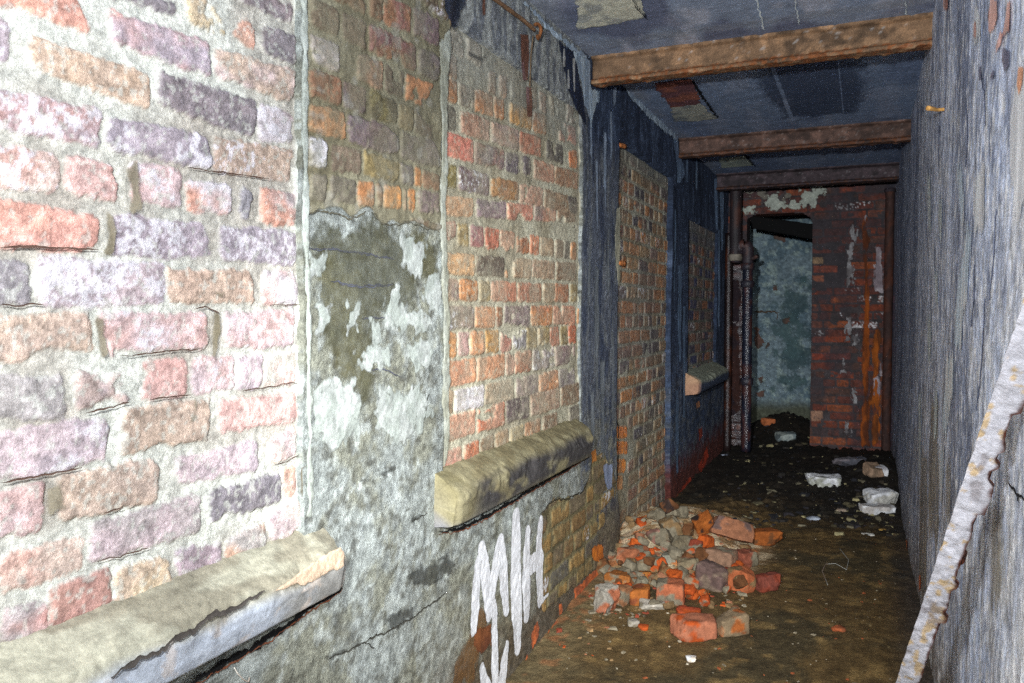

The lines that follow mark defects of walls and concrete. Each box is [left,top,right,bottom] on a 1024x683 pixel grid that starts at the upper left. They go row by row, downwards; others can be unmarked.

peeling [742,185,835,215]
water stain [317,216,438,403]
corrosion [859,217,883,447]
spalling [541,207,781,614]
crack [411,458,587,535]
spalling [111,547,345,678]
crack [191,588,343,683]
crack [329,592,447,659]